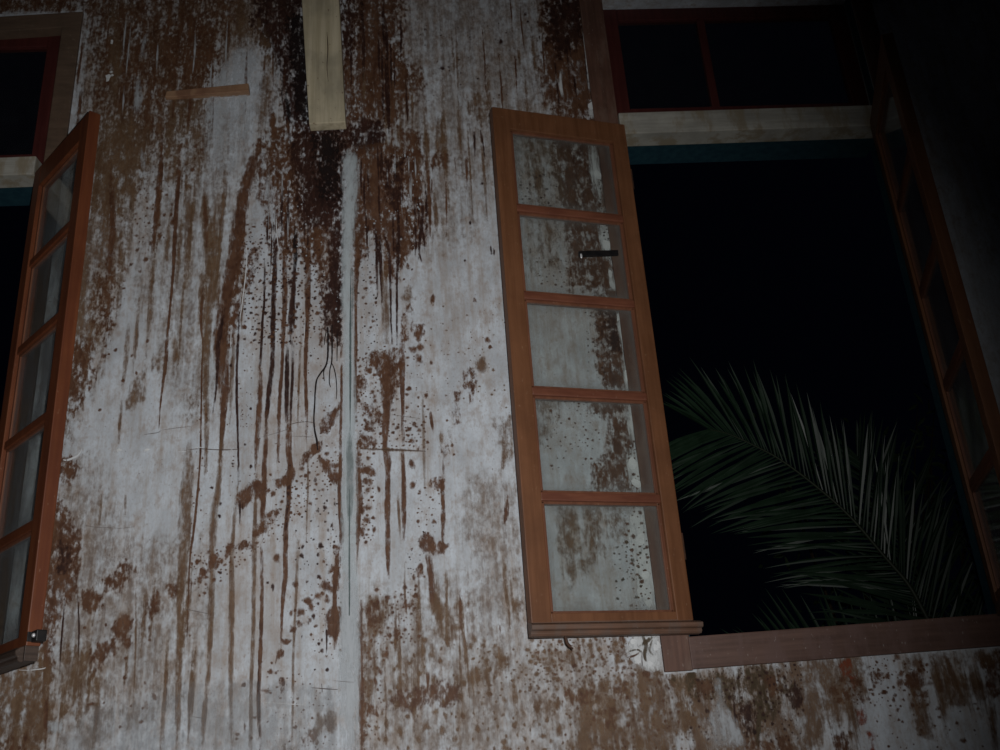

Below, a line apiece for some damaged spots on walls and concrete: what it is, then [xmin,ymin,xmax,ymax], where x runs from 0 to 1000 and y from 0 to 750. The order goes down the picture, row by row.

corrosion [537,0,594,121]
corrosion [519,141,606,213]
corrosion [528,219,616,298]
corrosion [444,330,494,401]
corrosion [585,309,626,390]
corrosion [190,118,455,750]
corrosion [493,407,513,468]
corrosion [536,400,635,492]
corrosion [558,506,635,580]
corrosion [40,500,136,696]
corrosion [145,582,179,641]
corrosion [454,637,942,750]